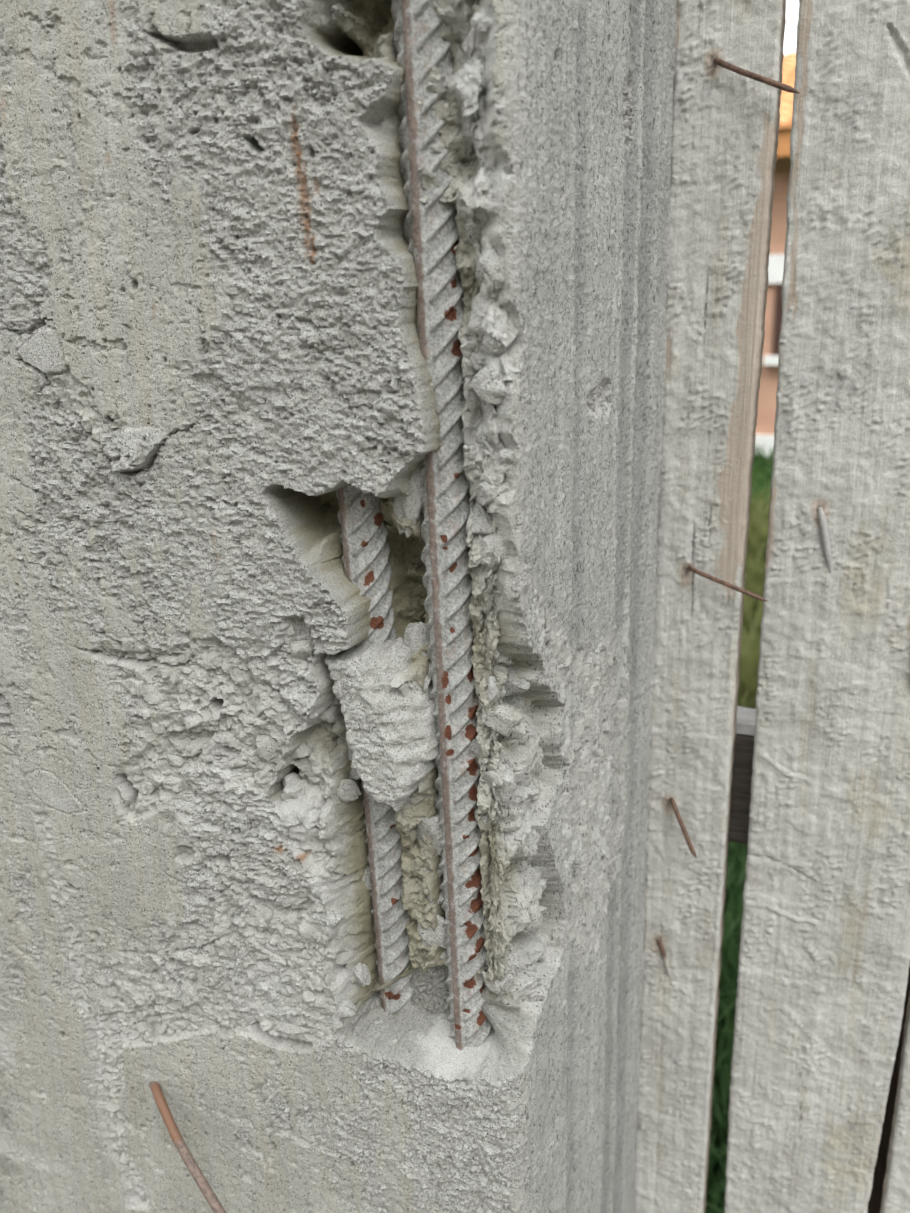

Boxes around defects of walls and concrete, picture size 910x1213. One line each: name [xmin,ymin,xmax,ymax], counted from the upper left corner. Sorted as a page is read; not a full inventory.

peeling [621,72,636,151]
rust [288,99,321,274]
rust [442,307,463,358]
rust [361,499,384,549]
rust [441,534,458,575]
spalling [17,0,632,1212]
rust [370,613,390,640]
rust [442,670,452,708]
rust [466,666,475,685]
rust [445,704,486,995]
rust [381,991,405,1002]
rust [454,1009,486,1032]